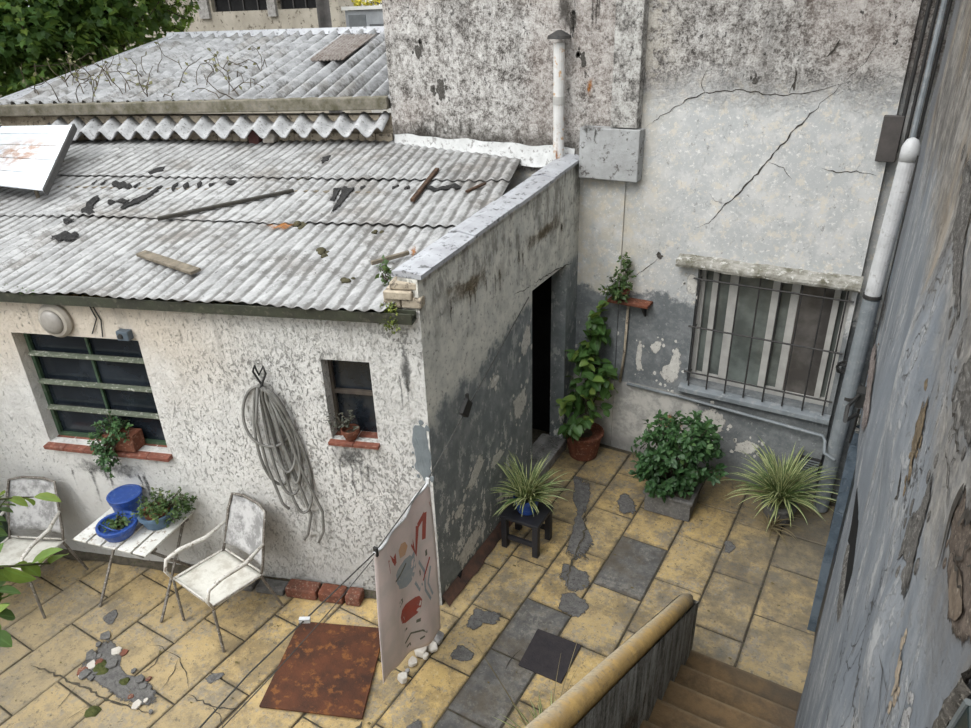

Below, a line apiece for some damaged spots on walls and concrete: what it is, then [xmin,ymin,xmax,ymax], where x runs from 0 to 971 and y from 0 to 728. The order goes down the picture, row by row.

crack [648,35,884,226]
leakage [449,270,501,305]
peeling [635,337,684,393]
spalling [948,144,971,461]
spalling [895,379,939,600]
spalling [936,483,971,645]
crack [847,583,912,728]